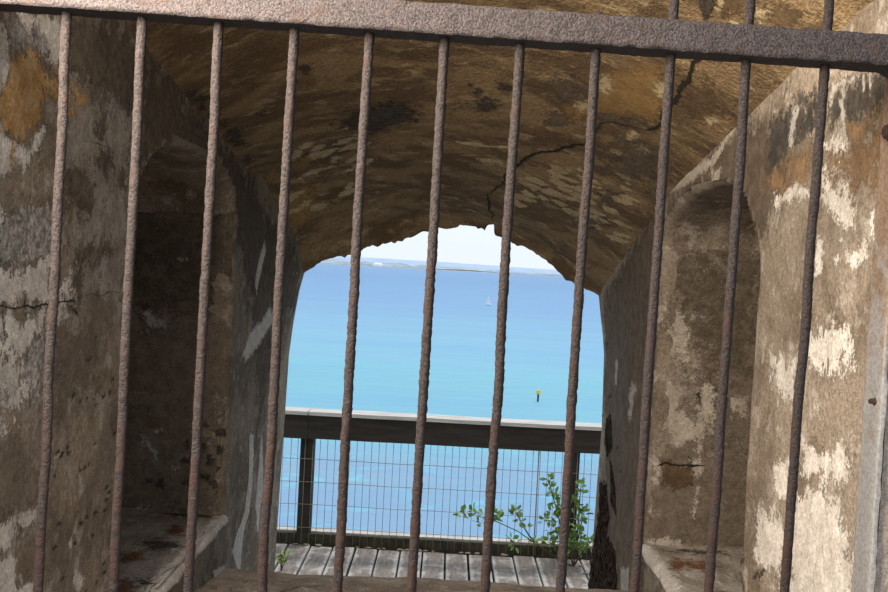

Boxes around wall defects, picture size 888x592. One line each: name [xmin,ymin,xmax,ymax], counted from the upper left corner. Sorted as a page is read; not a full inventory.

damp [720,0,746,22]
damp [767,1,823,29]
damp [529,74,601,131]
crack [486,59,700,221]
damp [828,72,887,145]
crack [0,290,119,332]
damp [594,83,818,592]
peeling [769,313,857,414]
peeling [740,432,855,592]